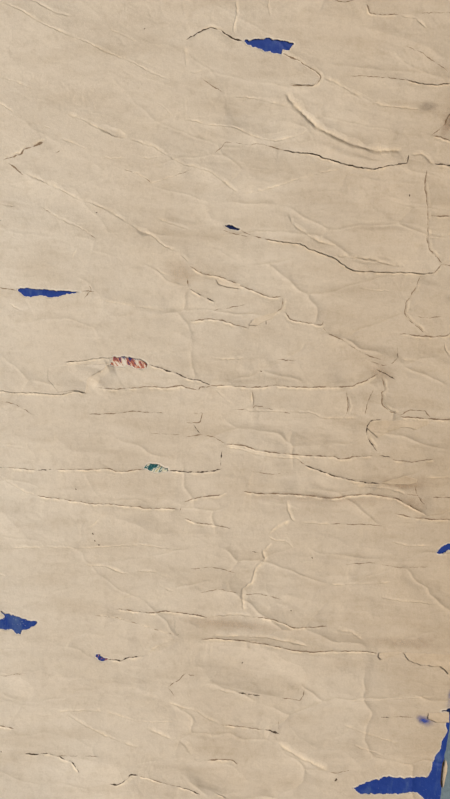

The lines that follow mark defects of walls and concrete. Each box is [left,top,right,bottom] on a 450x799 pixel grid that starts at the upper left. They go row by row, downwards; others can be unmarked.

crack [365,2,450,29]
crack [432,114,450,145]
crack [3,138,59,175]
crack [424,163,450,269]
crack [38,267,450,531]
crack [0,467,144,476]
crack [117,609,207,620]
crack [253,617,325,632]
crack [108,656,143,665]
crack [223,722,279,734]
crack [24,753,97,774]
crack [108,774,200,797]